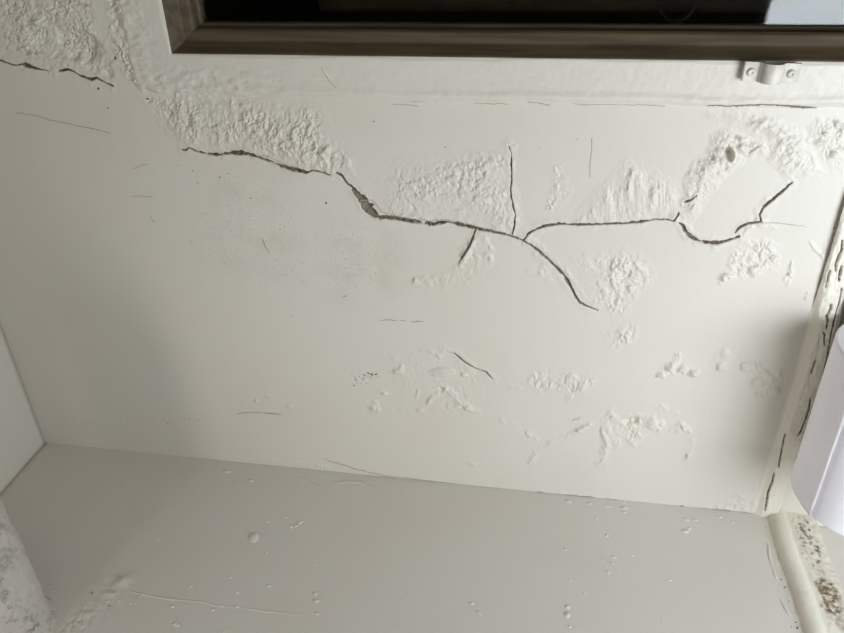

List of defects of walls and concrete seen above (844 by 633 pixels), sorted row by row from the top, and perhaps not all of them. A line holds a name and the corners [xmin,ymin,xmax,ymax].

crack [0,60,118,95]
crack [174,137,803,318]
peeling [807,238,829,261]
crack [439,341,502,387]